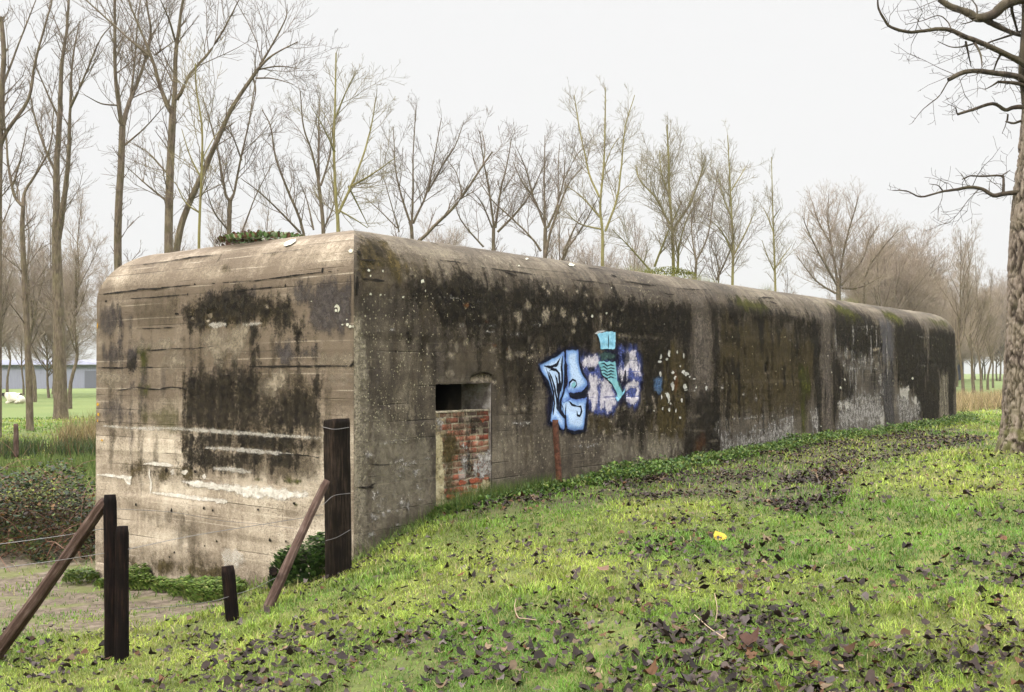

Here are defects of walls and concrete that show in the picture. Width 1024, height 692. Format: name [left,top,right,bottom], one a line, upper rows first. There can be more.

water stain [97,287,322,504]
water stain [357,240,955,456]